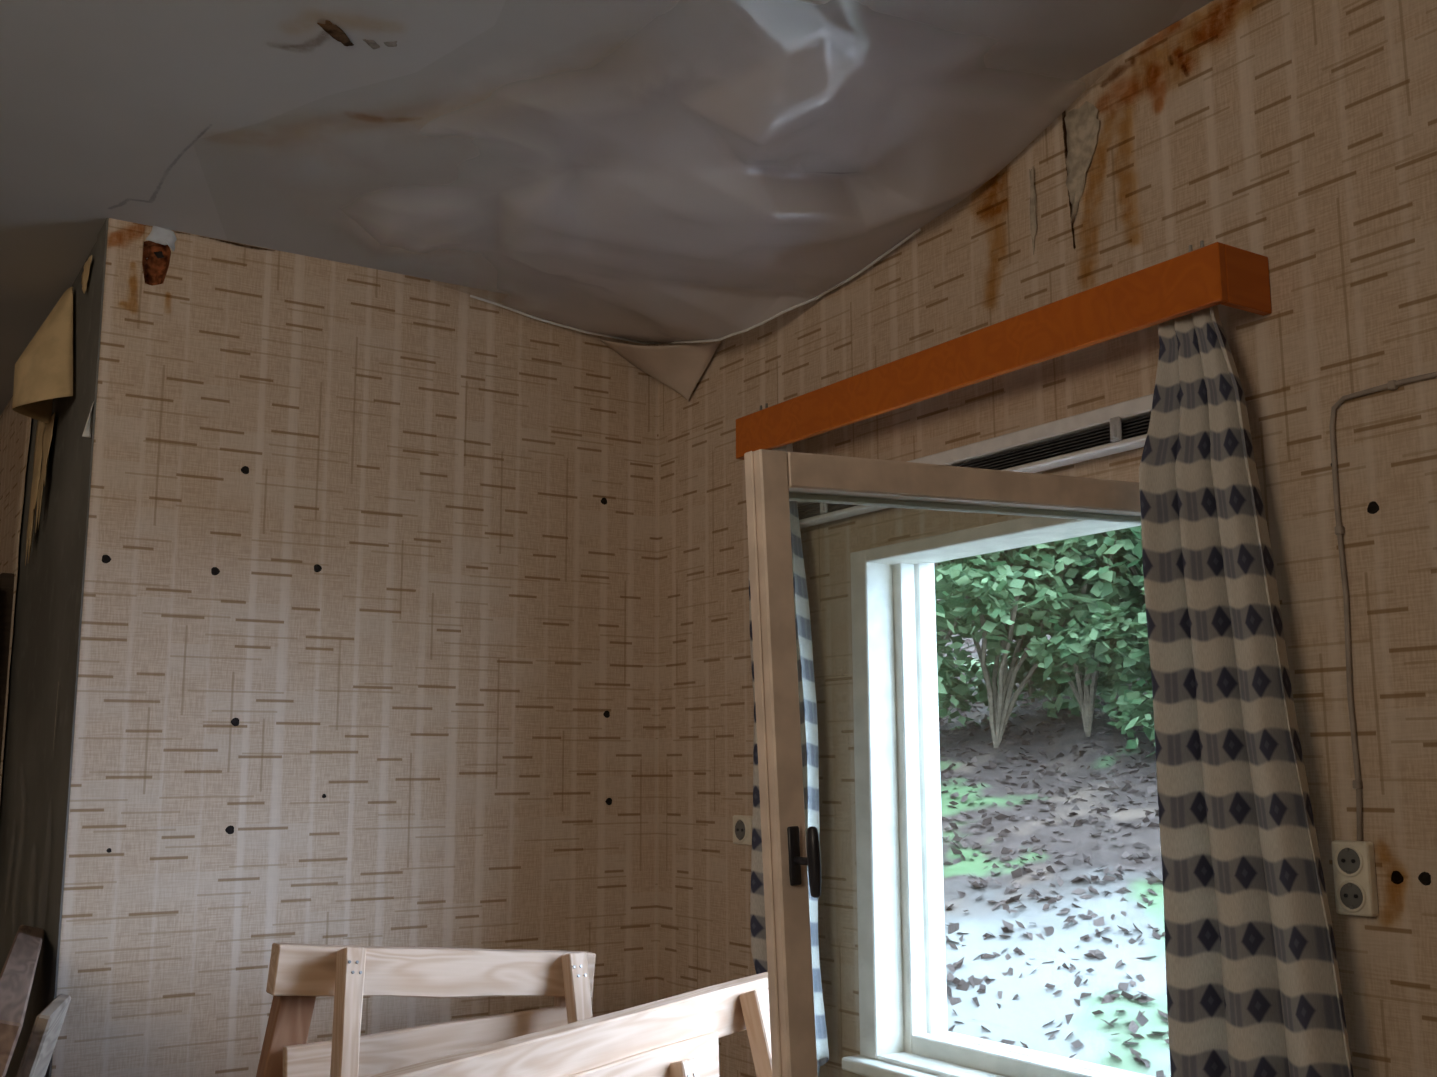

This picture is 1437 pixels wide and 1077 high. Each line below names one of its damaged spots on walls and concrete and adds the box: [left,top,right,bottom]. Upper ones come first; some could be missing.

spalling [317,20,397,49]